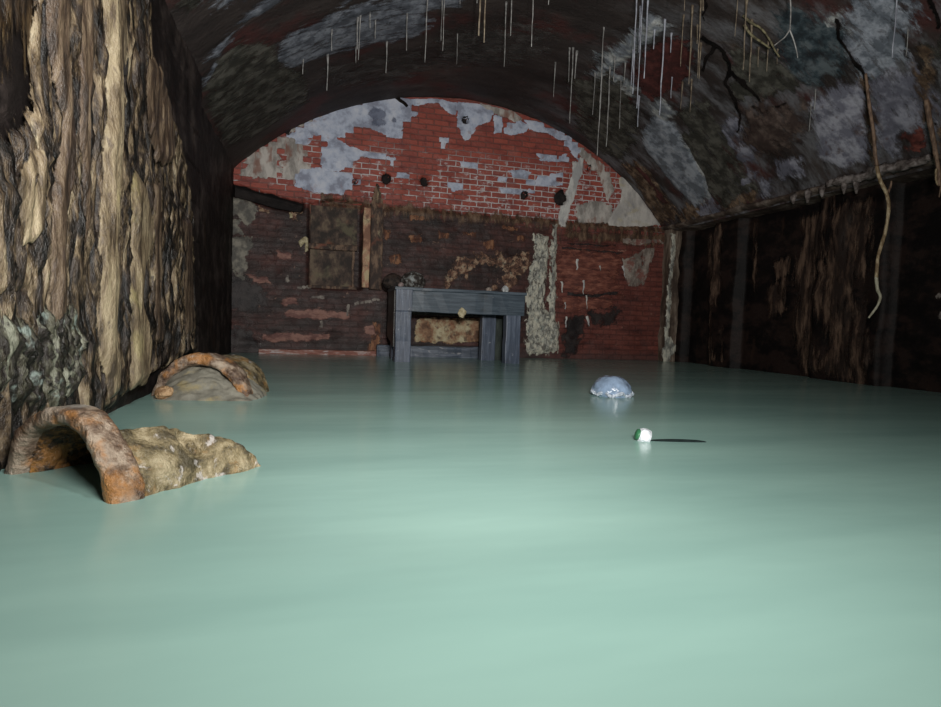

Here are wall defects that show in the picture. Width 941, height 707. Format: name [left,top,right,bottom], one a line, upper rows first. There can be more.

leakage [202,0,280,87]
leakage [323,23,556,85]
leakage [590,14,676,97]
crack [700,0,787,133]
leakage [772,3,848,86]
crack [835,18,867,104]
crack [927,0,941,29]
peeling [232,36,806,318]
leakage [790,153,933,204]
leakage [383,157,676,361]
peeling [262,332,330,343]
peeling [281,297,350,320]